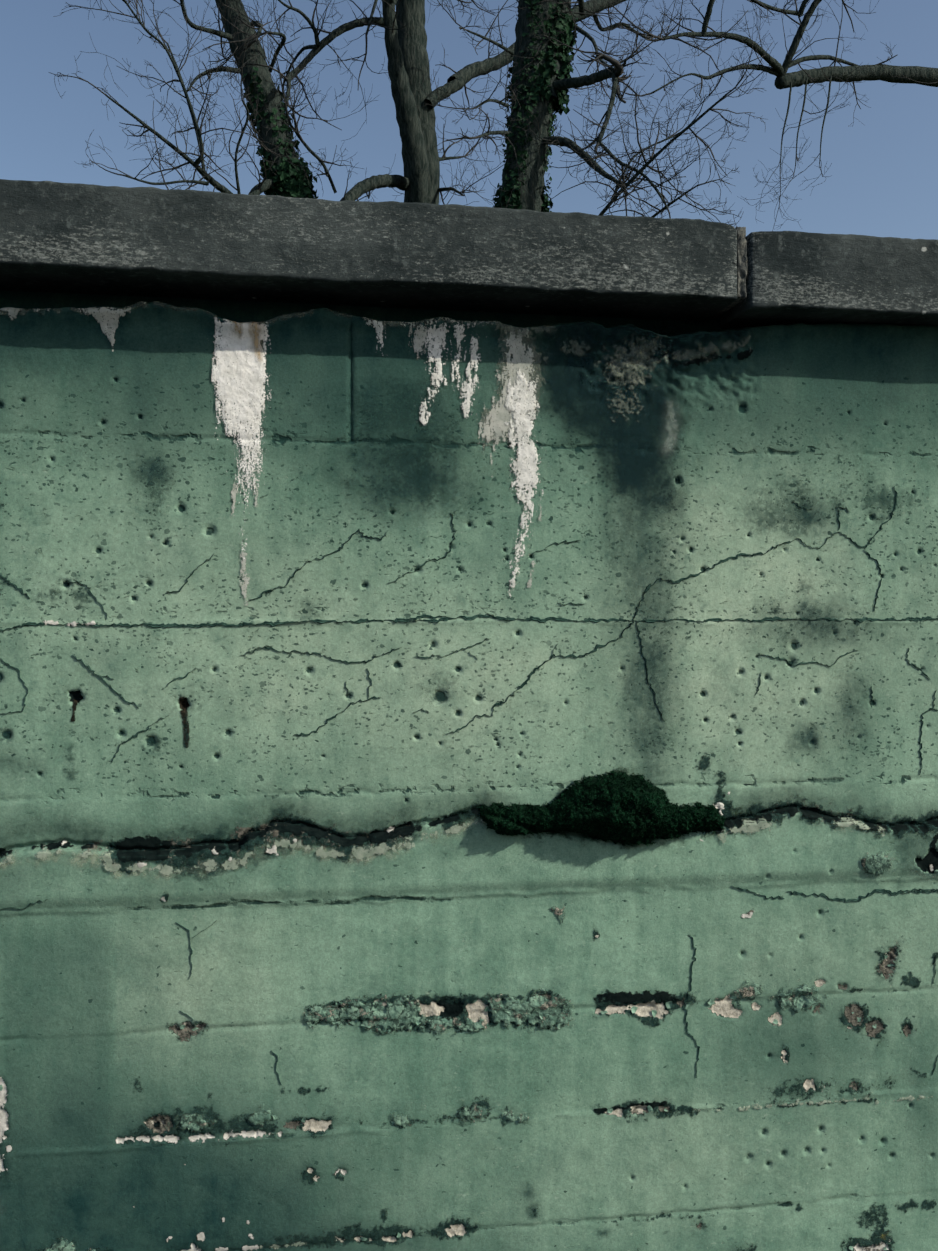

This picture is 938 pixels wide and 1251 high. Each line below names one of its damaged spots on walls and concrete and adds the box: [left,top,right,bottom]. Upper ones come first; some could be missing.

damp [0,301,745,606]
crack [0,486,938,775]
spalling [905,834,938,878]
crack [733,886,938,902]
spalling [304,989,574,1035]
spalling [593,979,913,1046]
peeling [0,1077,12,1172]
spalling [116,1105,333,1146]
spalling [594,1099,722,1123]
spalling [738,1077,933,1111]
spalling [181,1215,478,1251]
peeling [841,1202,895,1251]